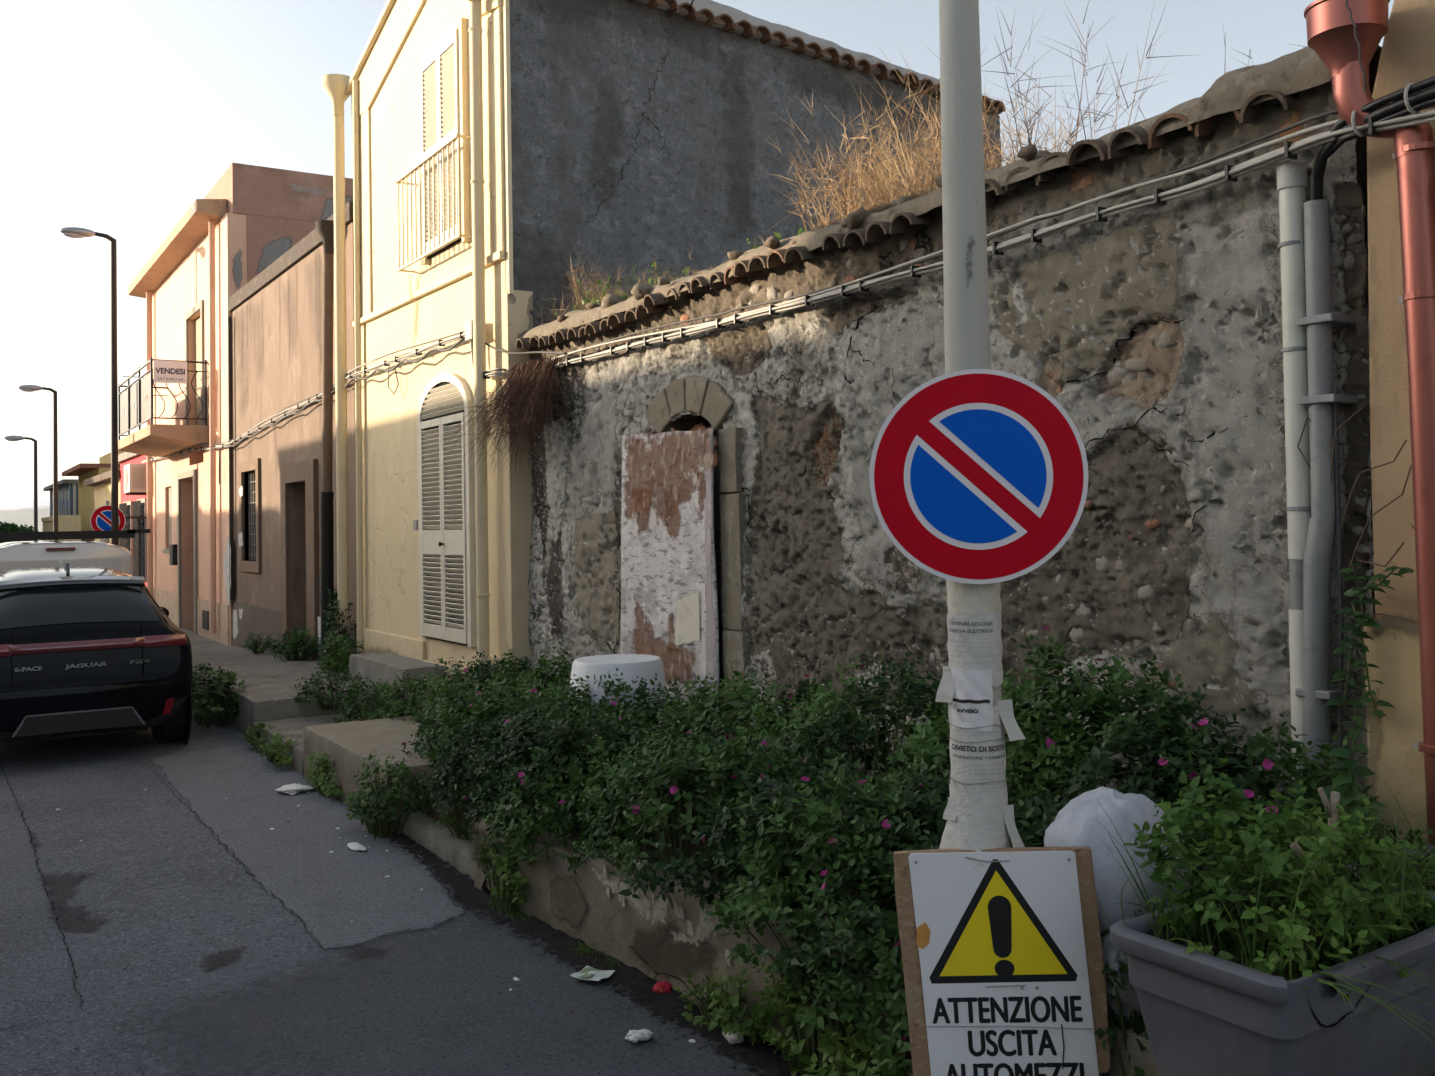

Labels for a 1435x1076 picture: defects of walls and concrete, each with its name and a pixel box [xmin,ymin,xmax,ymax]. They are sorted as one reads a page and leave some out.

crack [578,19,674,239]
spalling [985,198,998,233]
spalling [529,190,949,712]
spalling [992,206,1290,700]
peeling [586,860,731,966]